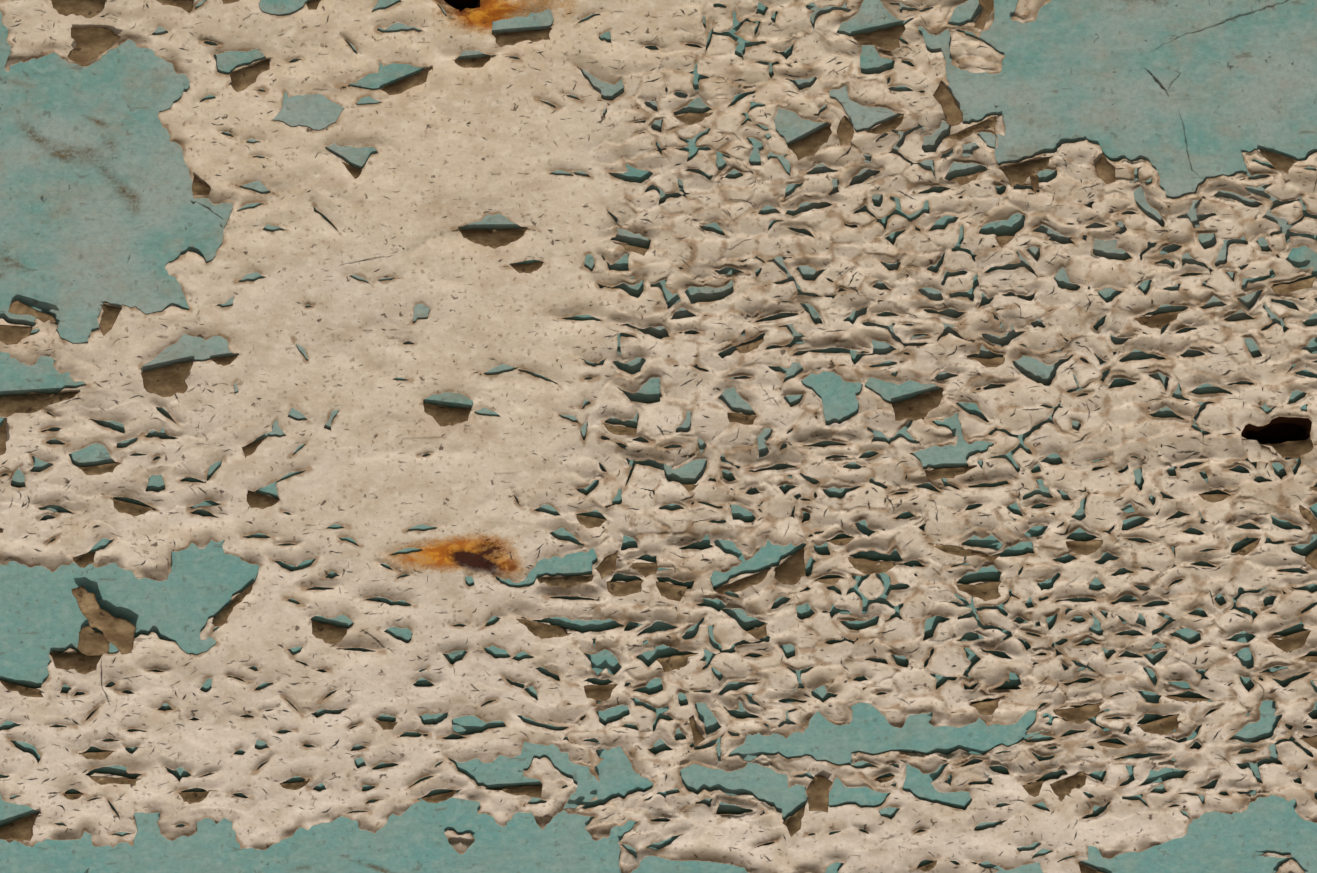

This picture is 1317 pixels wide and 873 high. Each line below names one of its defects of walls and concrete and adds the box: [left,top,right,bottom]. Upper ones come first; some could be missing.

corrosion [440,0,563,30]
peeling [561,53,632,109]
peeling [647,94,717,136]
peeling [595,157,662,190]
peeling [741,0,1317,396]
peeling [681,276,741,309]
peeling [0,0,566,700]
peeling [563,224,666,436]
peeling [617,432,744,492]
corrosion [395,535,523,577]
peeling [0,477,1317,873]